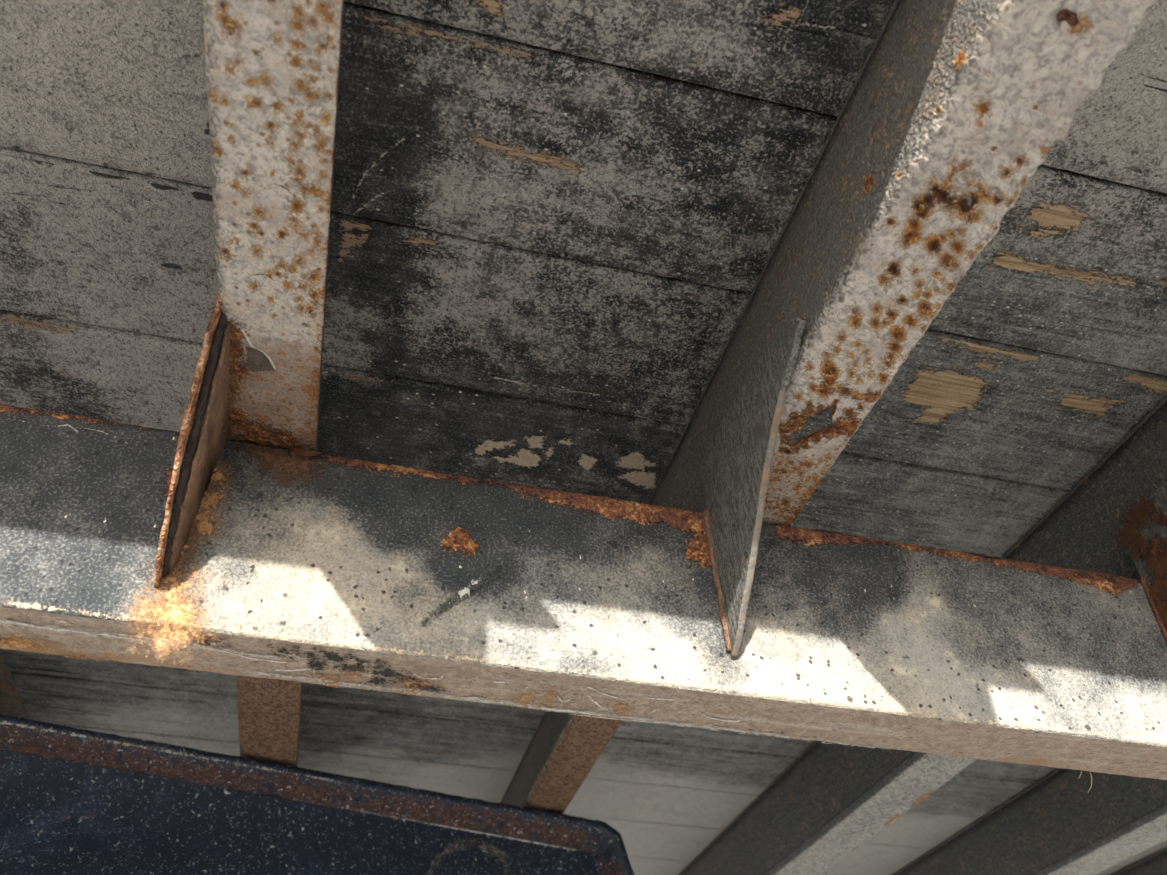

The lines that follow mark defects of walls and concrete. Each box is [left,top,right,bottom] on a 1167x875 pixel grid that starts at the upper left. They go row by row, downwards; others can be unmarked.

peeling [473,0,508,19]
rust [209,0,339,327]
peeling [1017,197,1090,240]
peeling [987,250,1138,288]
rust [778,155,1028,512]
peeling [902,337,1039,426]
rust [225,319,711,568]
peeling [474,435,598,470]
peeling [615,452,656,489]
rust [134,468,225,647]
rust [775,524,1139,596]